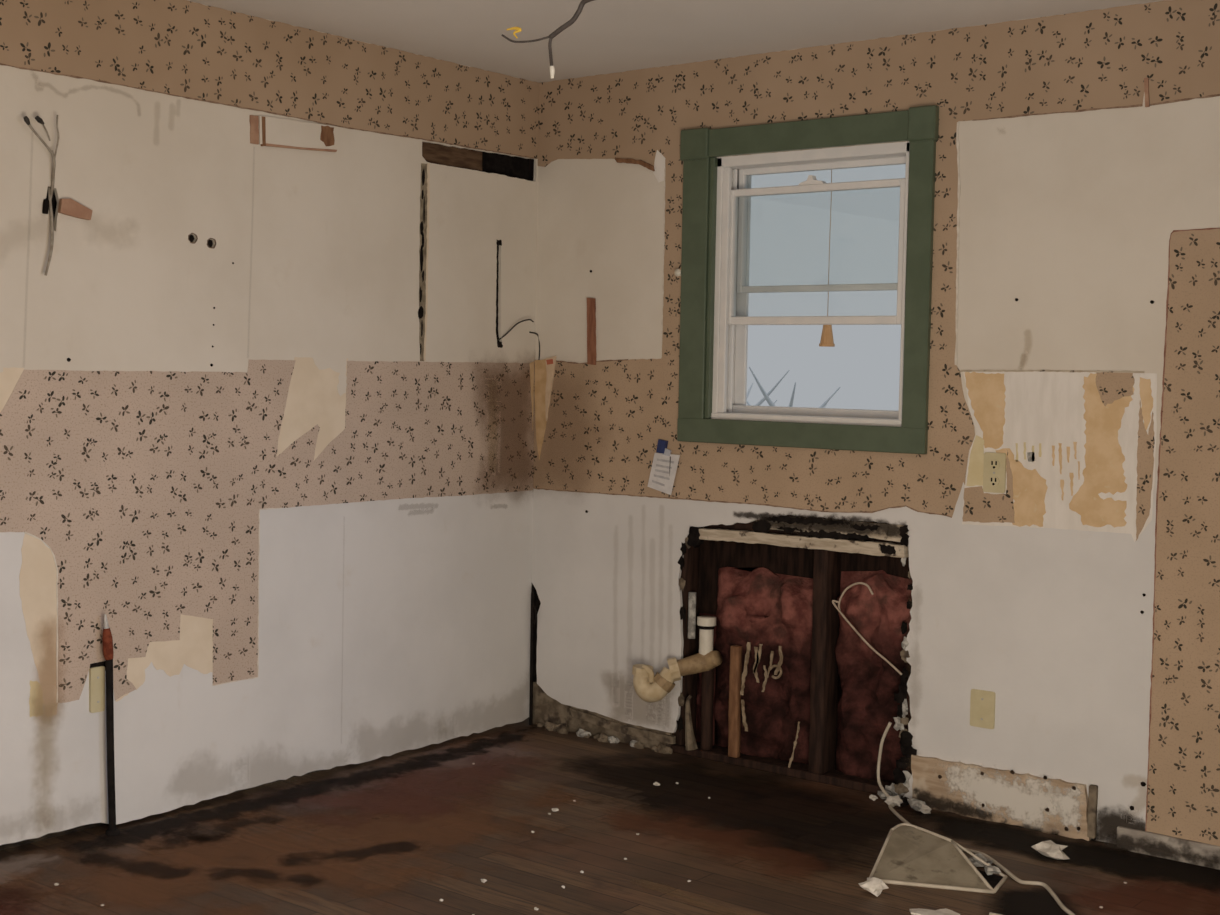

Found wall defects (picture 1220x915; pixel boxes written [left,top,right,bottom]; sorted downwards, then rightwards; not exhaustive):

peeling [0,365,24,412]
peeling [277,354,348,460]
peeling [530,356,557,459]
peeling [960,370,1157,542]
flaking render [677,536,691,591]
leakage [734,512,905,537]
peeling [19,534,58,717]
peeling [116,614,213,702]
flaking render [532,589,684,754]
flaking render [752,515,932,814]
leakage [914,788,1005,824]
leakage [1091,808,1220,869]